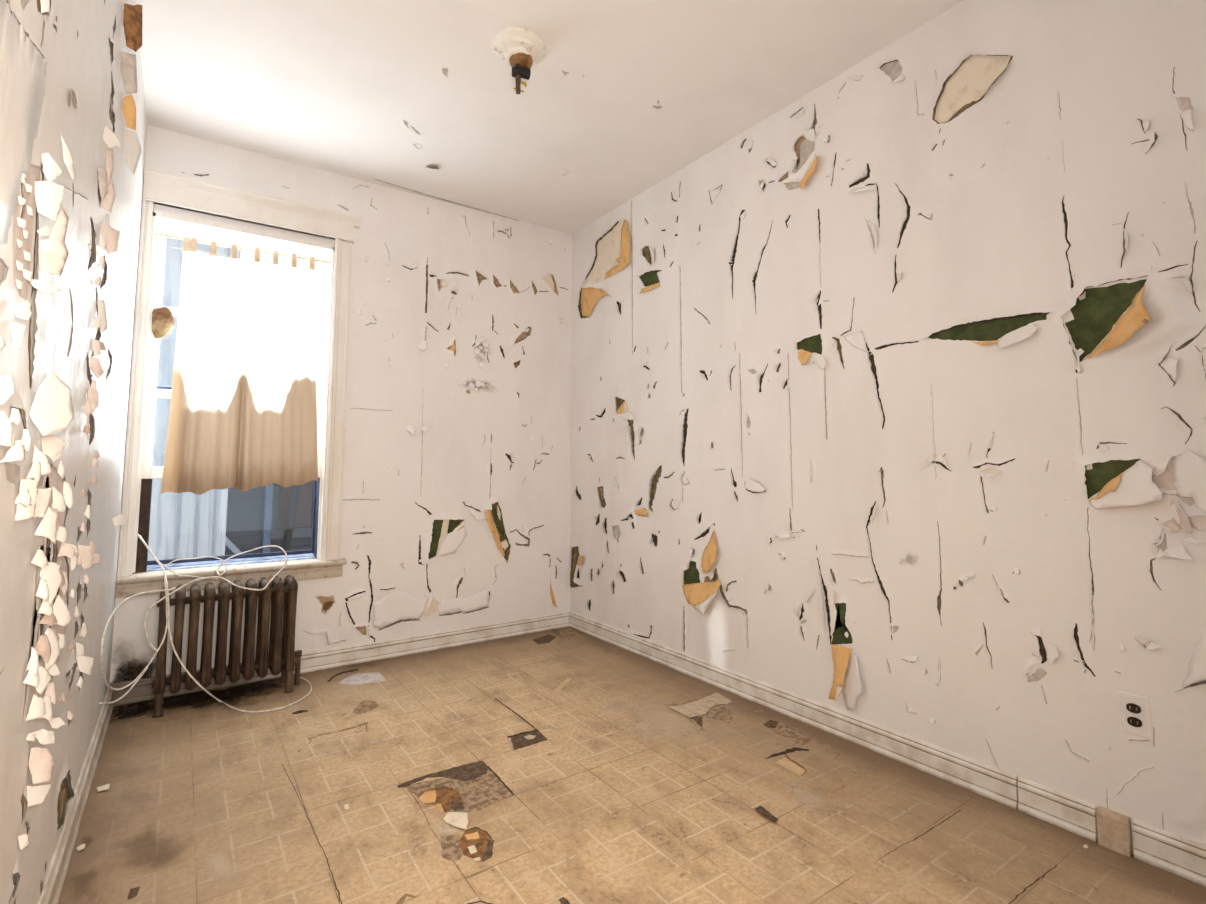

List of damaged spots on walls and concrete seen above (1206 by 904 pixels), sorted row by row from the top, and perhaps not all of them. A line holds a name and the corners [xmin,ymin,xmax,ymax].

peeling [121,3,142,175]
peeling [737,105,831,196]
spalling [920,38,1024,152]
peeling [432,270,558,369]
peeling [579,219,662,318]
crack [402,90,1206,677]
peeling [928,314,1047,349]
peeling [1065,279,1151,362]
peeling [0,135,120,904]
peeling [336,501,511,642]
peeling [682,529,721,615]
peeling [828,590,862,710]